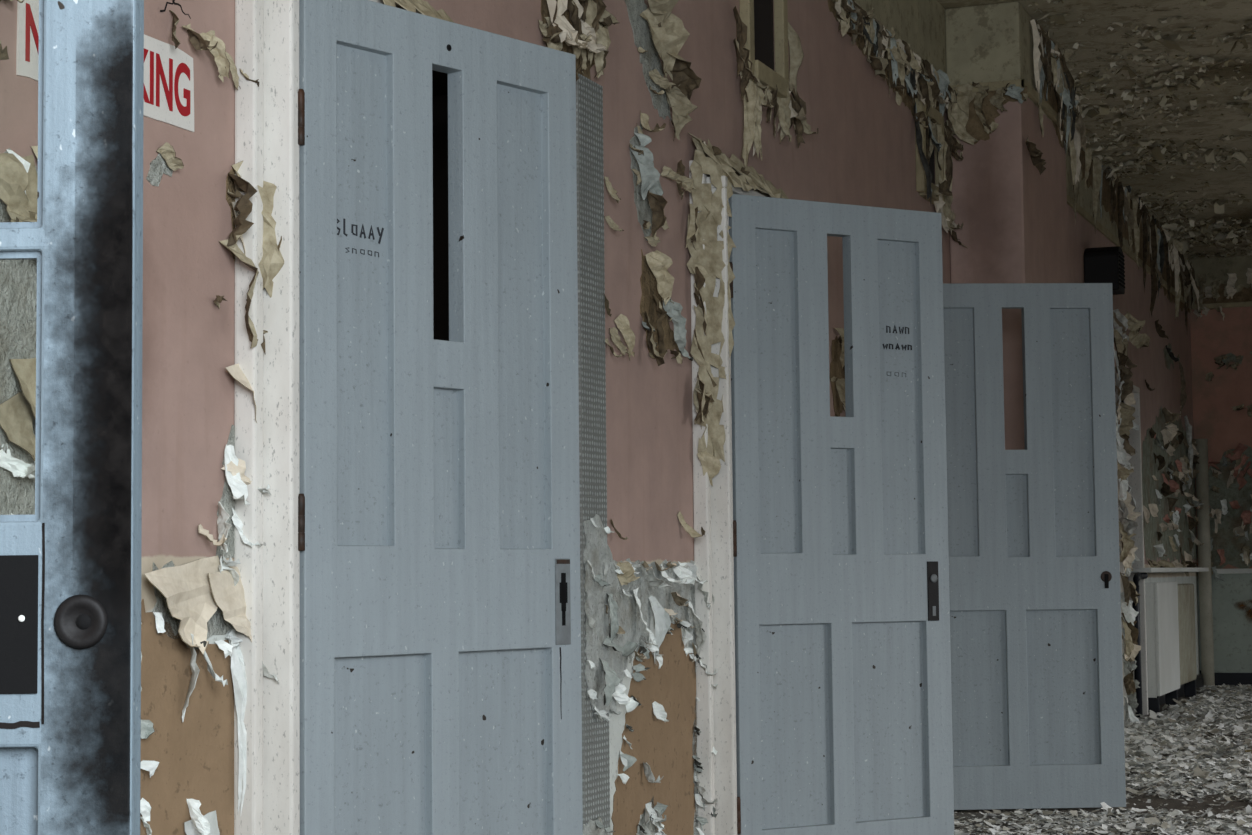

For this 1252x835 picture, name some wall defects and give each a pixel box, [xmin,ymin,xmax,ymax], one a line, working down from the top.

spalling [0,259,37,515]
spalling [0,146,38,222]
peeling [146,142,184,187]
peeling [225,363,257,423]
peeling [219,161,284,353]
peeling [538,0,819,486]
peeling [827,0,1252,724]
peeling [140,425,271,835]
peeling [583,511,718,835]